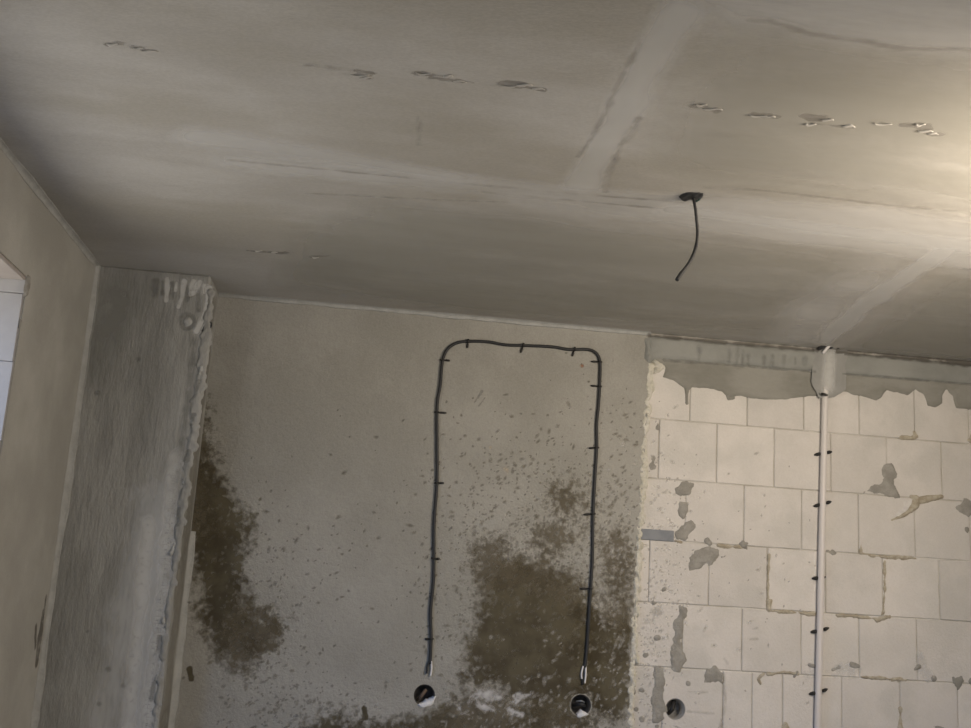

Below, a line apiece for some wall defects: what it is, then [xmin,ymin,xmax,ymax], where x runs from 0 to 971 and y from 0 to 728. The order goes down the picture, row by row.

spalling [498,80,547,92]
spalling [799,114,855,128]
water stain [91,277,214,365]
water stain [93,345,641,728]